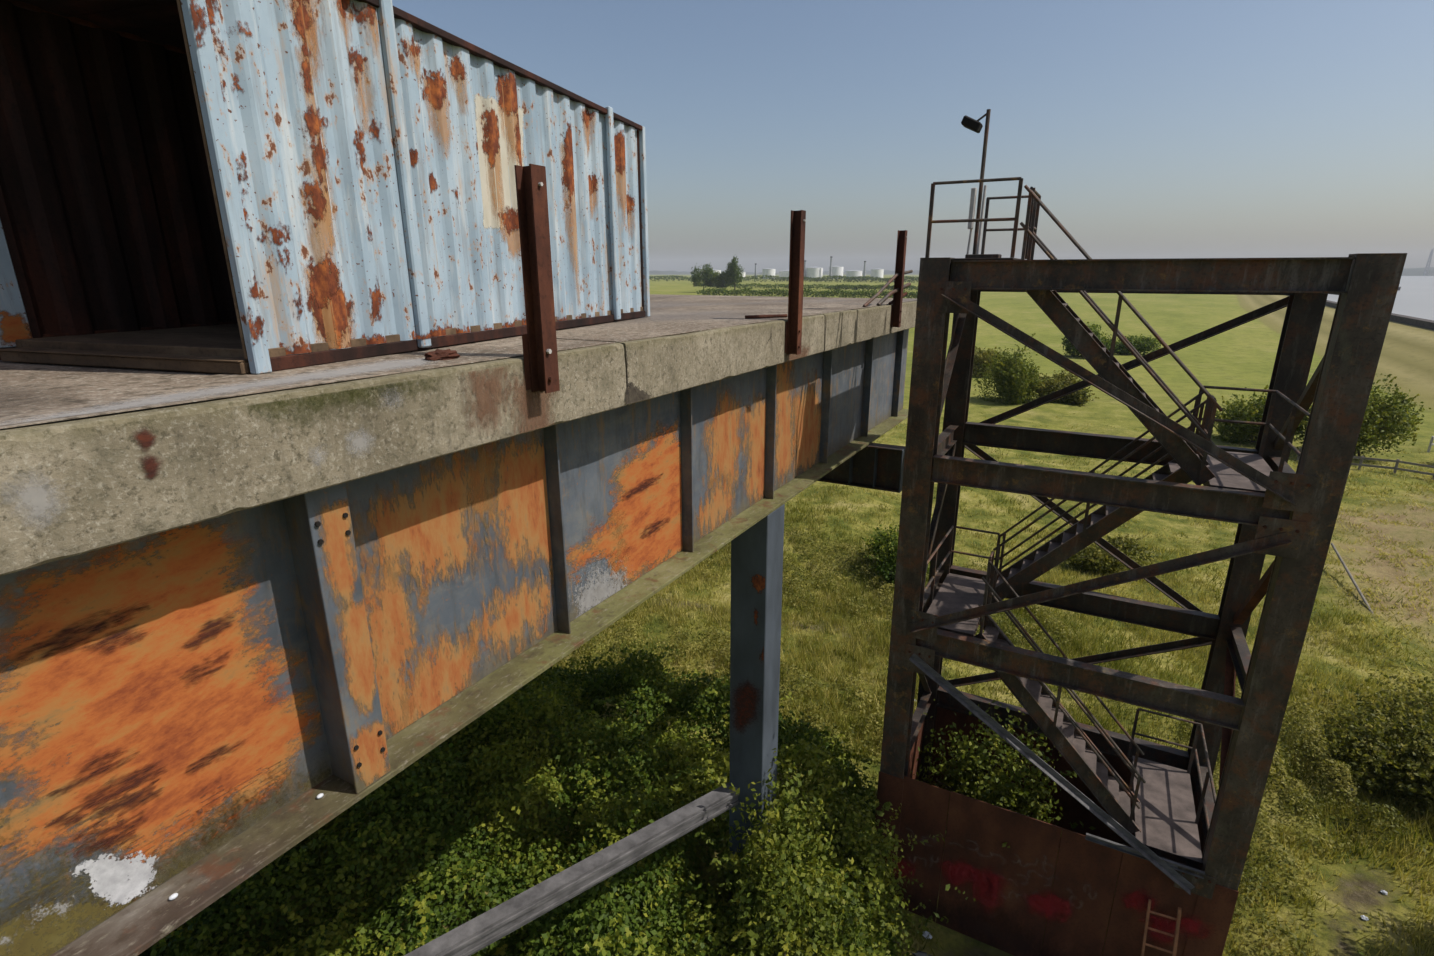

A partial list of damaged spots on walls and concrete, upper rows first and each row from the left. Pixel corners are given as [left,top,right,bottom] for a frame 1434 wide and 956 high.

corrosion [190,0,252,62]
corrosion [236,0,387,355]
corrosion [409,148,419,167]
corrosion [401,37,467,147]
corrosion [429,173,459,202]
corrosion [476,72,522,255]
corrosion [412,317,526,339]
corrosion [319,346,822,786]
corrosion [0,523,322,869]
damp [0,768,331,956]